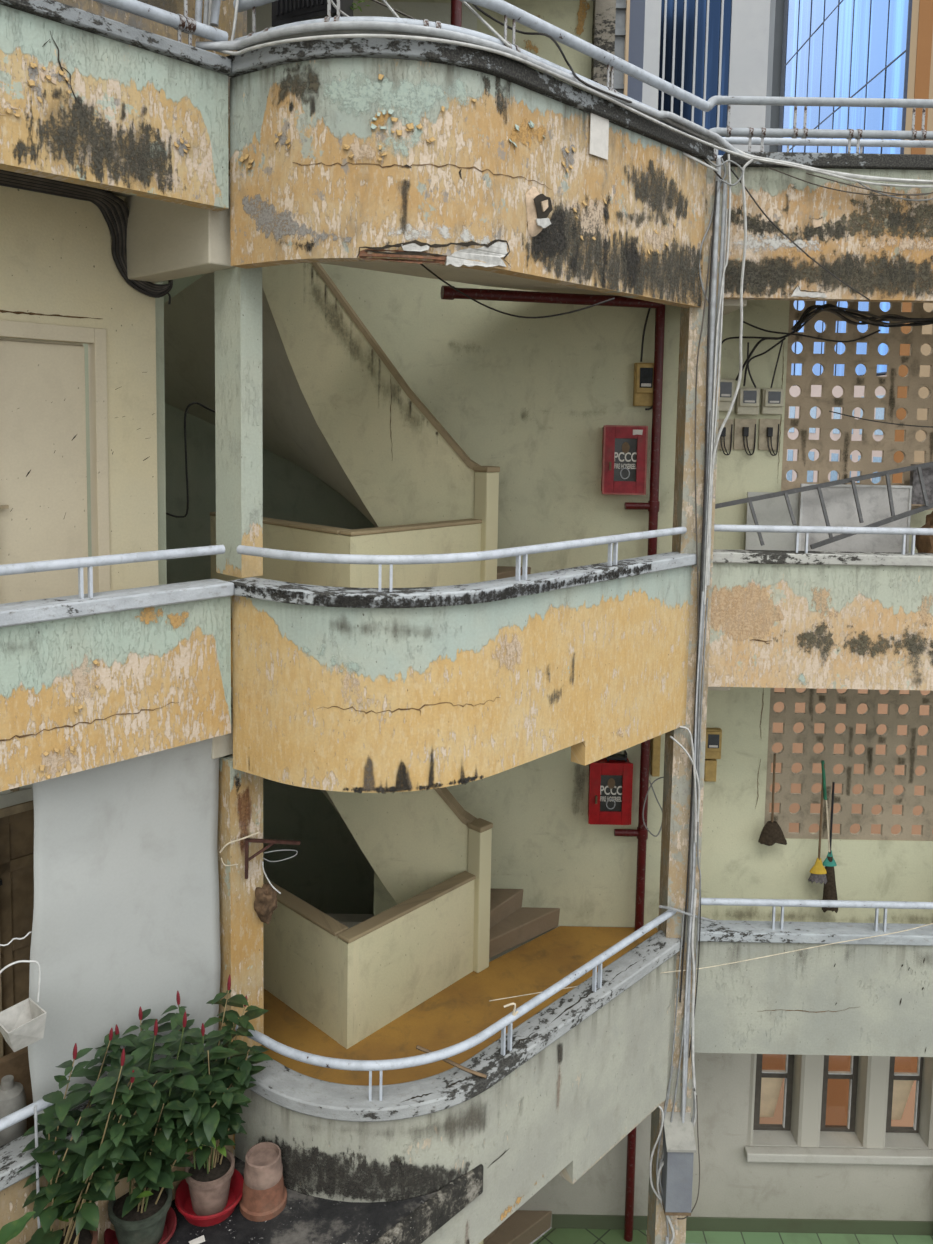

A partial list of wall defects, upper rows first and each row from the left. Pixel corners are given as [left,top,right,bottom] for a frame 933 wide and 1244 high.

peeling [27,62,72,103]
water stain [12,89,178,193]
peeling [324,71,477,161]
crack [292,162,552,190]
spalling [242,194,511,268]
water stain [522,160,707,307]
water stain [724,188,933,298]
peeling [135,607,189,629]
crack [0,702,179,741]
crack [318,697,500,714]
water stain [343,753,483,793]
water stain [258,1137,470,1202]